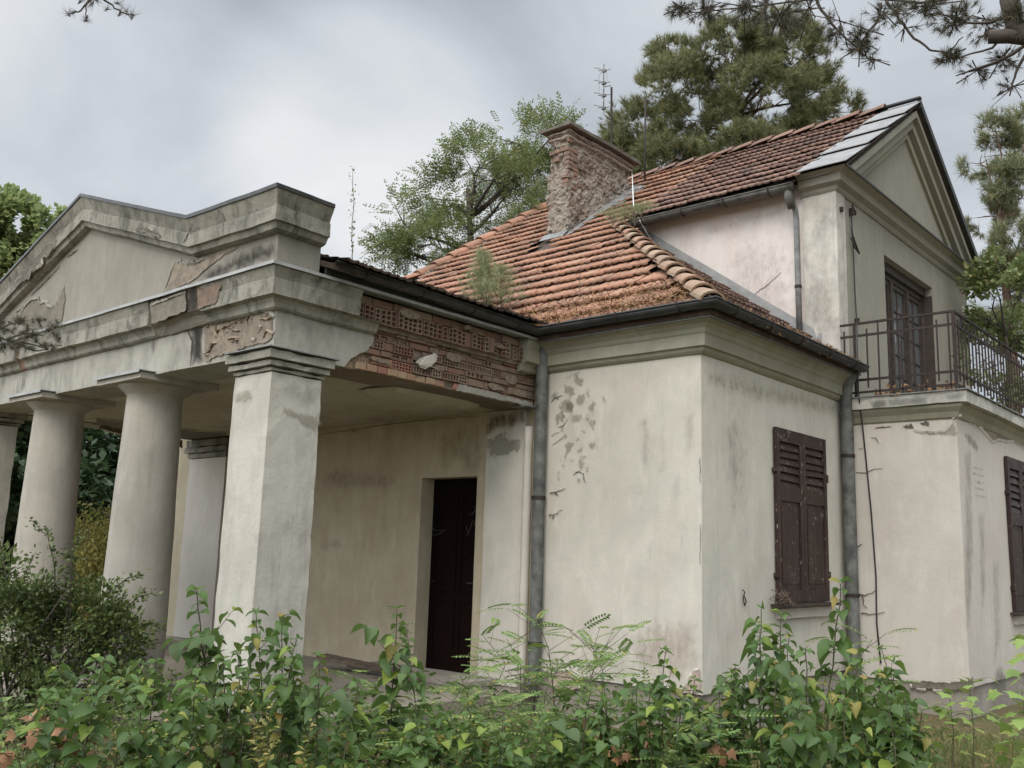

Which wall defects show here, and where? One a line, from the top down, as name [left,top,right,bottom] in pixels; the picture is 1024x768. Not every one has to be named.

peeling [20,288,65,330]
peeling [150,245,238,323]
peeling [203,311,275,361]
spalling [340,295,536,406]
peeling [552,372,604,432]
peeling [487,433,520,456]
peeling [903,414,1024,448]